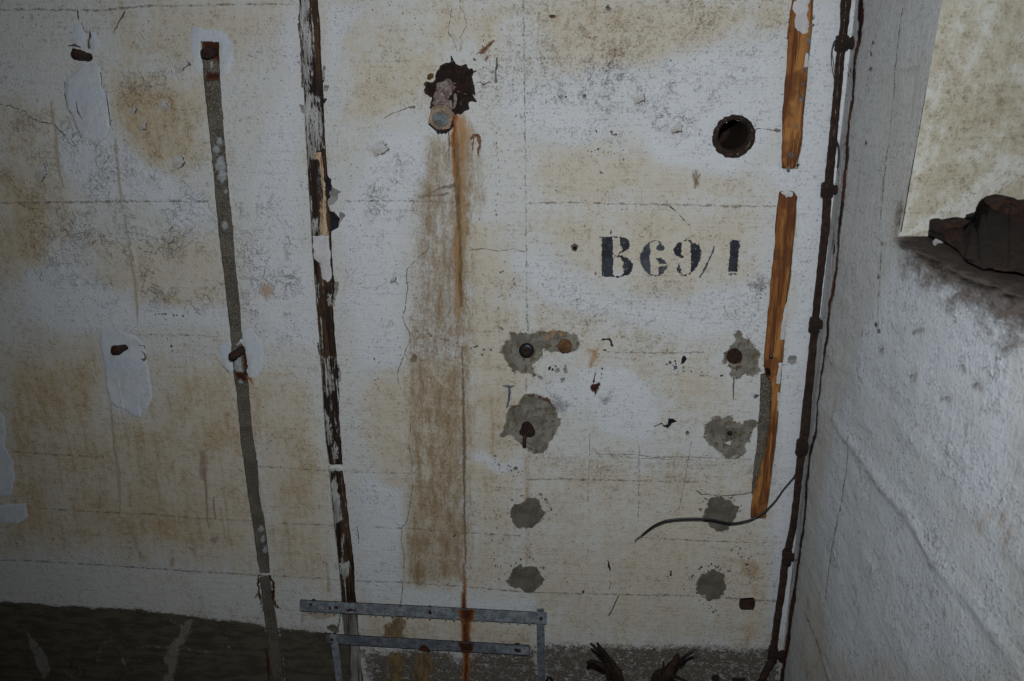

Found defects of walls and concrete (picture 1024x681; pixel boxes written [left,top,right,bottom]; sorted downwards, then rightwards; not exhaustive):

corrosion [424,40,495,320]
corrosion [234,353,253,384]
corrosion [300,351,534,681]